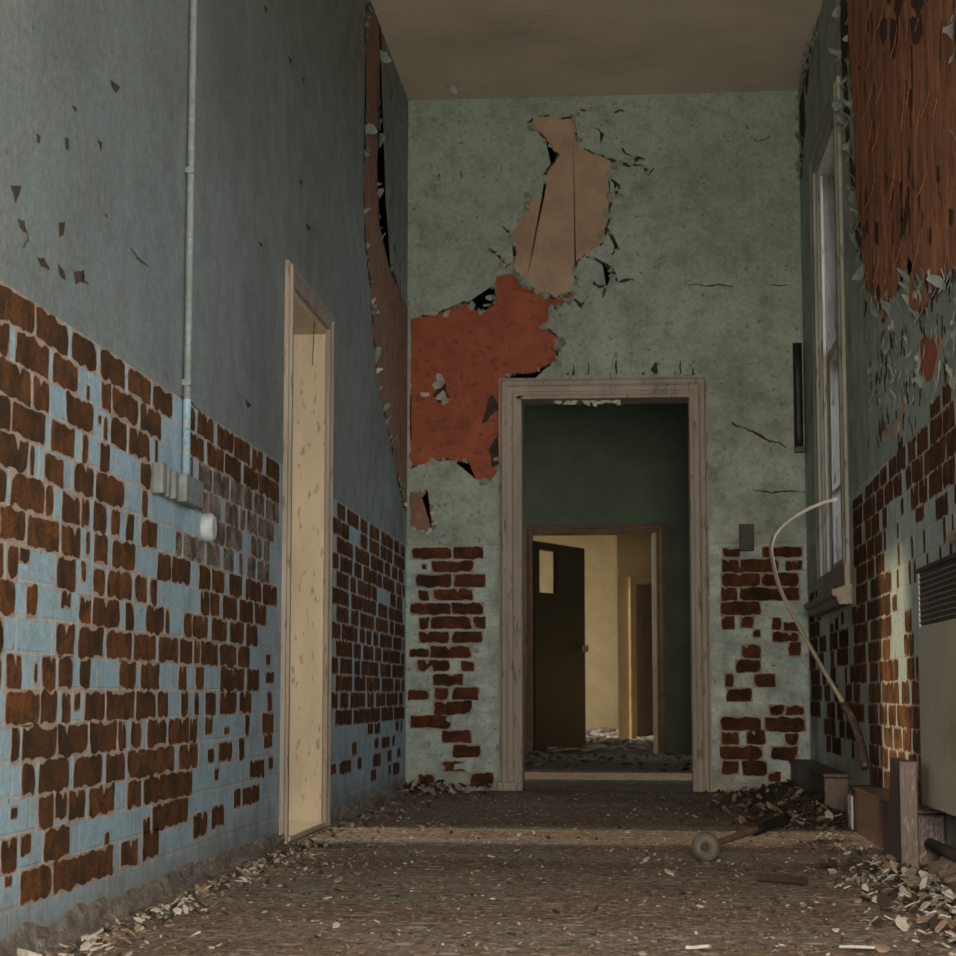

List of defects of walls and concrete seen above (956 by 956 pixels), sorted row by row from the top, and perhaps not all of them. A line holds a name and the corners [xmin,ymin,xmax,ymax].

peeling [0,282,280,907]
peeling [331,501,494,787]
peeling [363,2,655,535]
peeling [719,0,956,801]